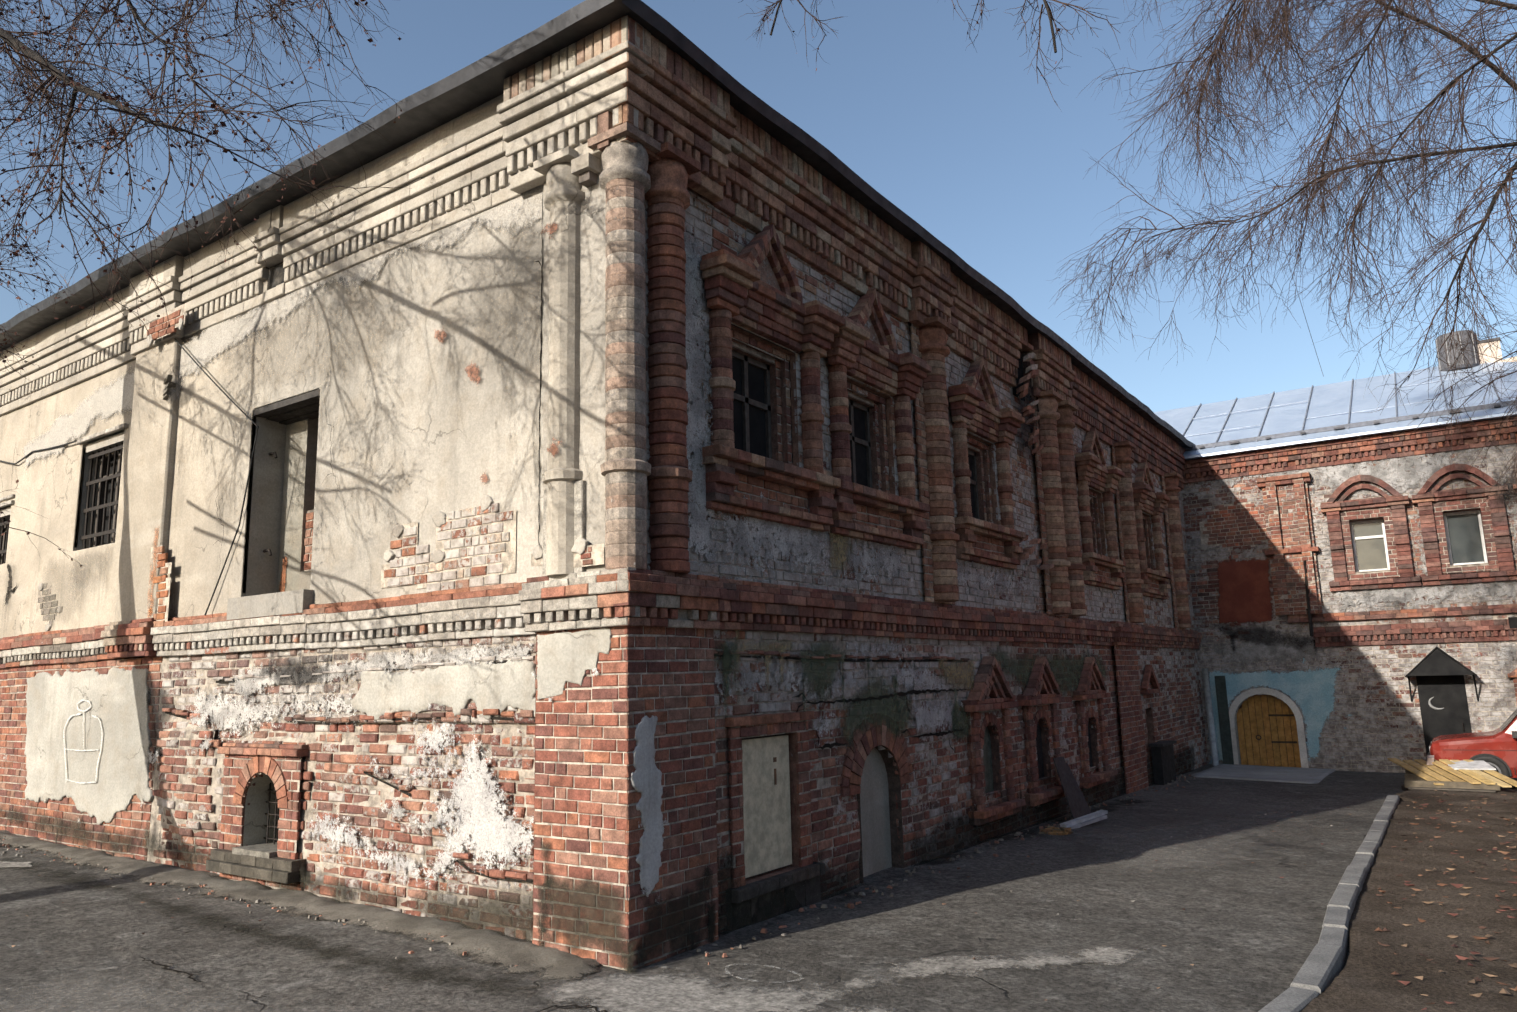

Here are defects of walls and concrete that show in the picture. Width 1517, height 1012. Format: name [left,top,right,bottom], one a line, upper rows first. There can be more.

flaking render [144,303,186,346]
peeling [381,473,543,592]
peeling [162,637,552,900]